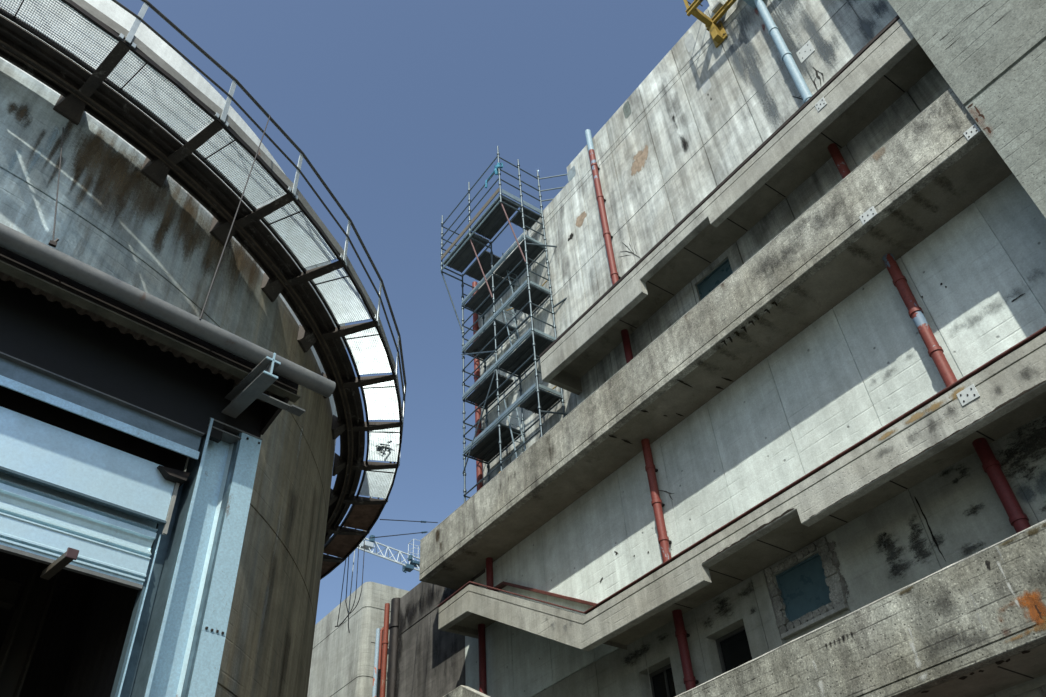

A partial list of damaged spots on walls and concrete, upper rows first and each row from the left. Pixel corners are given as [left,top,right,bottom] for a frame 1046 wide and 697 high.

damp [8,103,29,123]
damp [30,121,258,295]
damp [1001,420,1046,501]
damp [878,516,943,576]
crack [914,496,946,561]
corrosion [1004,591,1046,640]